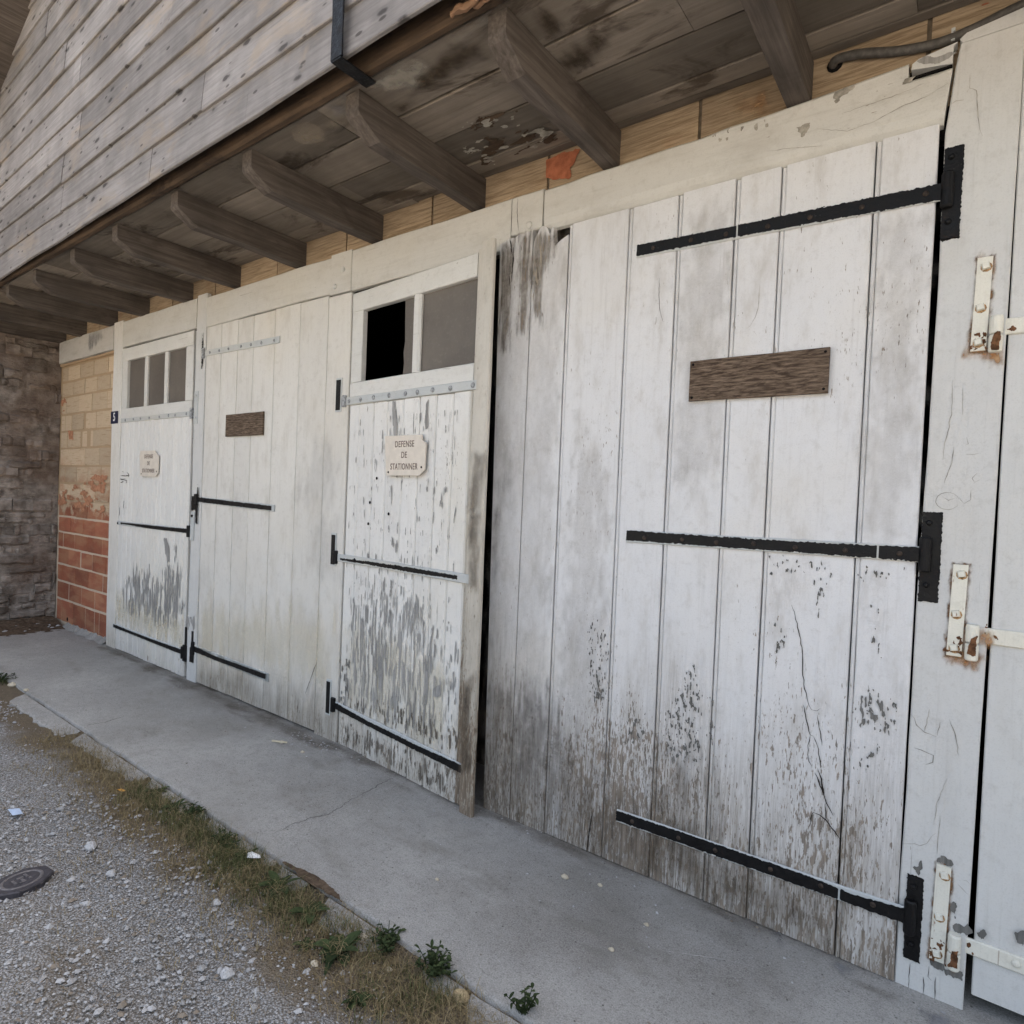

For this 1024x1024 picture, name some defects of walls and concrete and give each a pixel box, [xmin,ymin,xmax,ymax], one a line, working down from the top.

peeling [469,111,558,165]
corrosion [962,255,1017,363]
peeling [58,474,107,513]
peeling [339,400,459,749]
peeling [769,556,832,618]
corrosion [943,563,998,667]
peeling [343,724,449,793]
peeling [621,713,646,746]
peeling [665,665,715,764]
crack [794,612,841,840]
peeling [852,685,897,769]
corrosion [927,863,974,969]